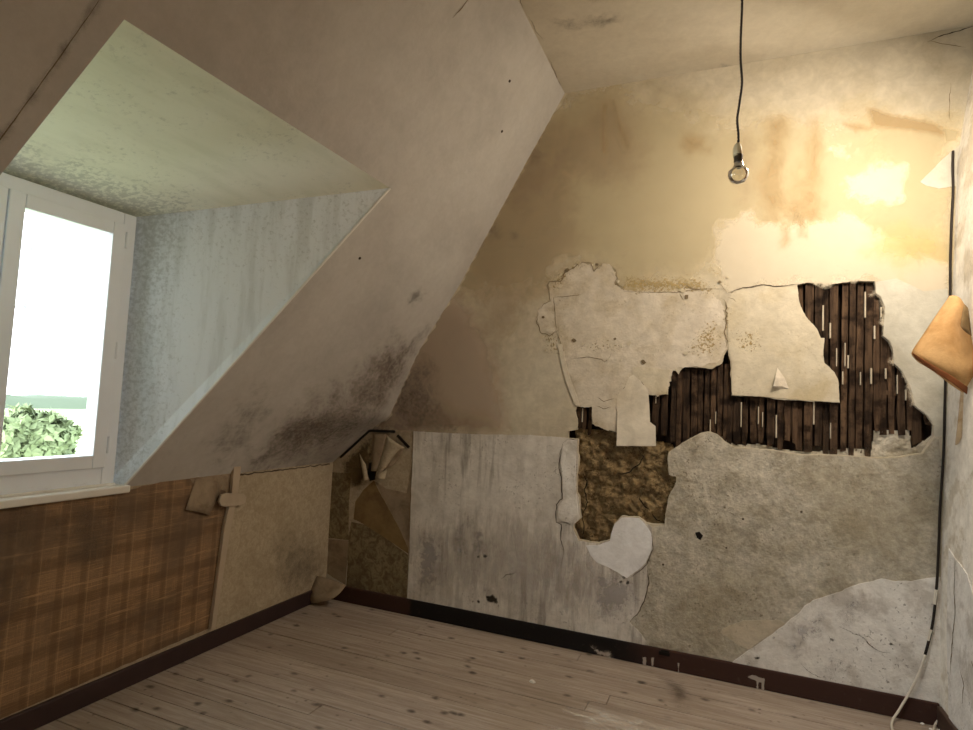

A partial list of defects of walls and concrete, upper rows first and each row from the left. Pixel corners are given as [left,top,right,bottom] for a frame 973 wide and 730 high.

leakage [465,87,957,287]
flaking render [921,145,960,189]
leakage [382,300,498,427]
flaking render [407,212,973,730]